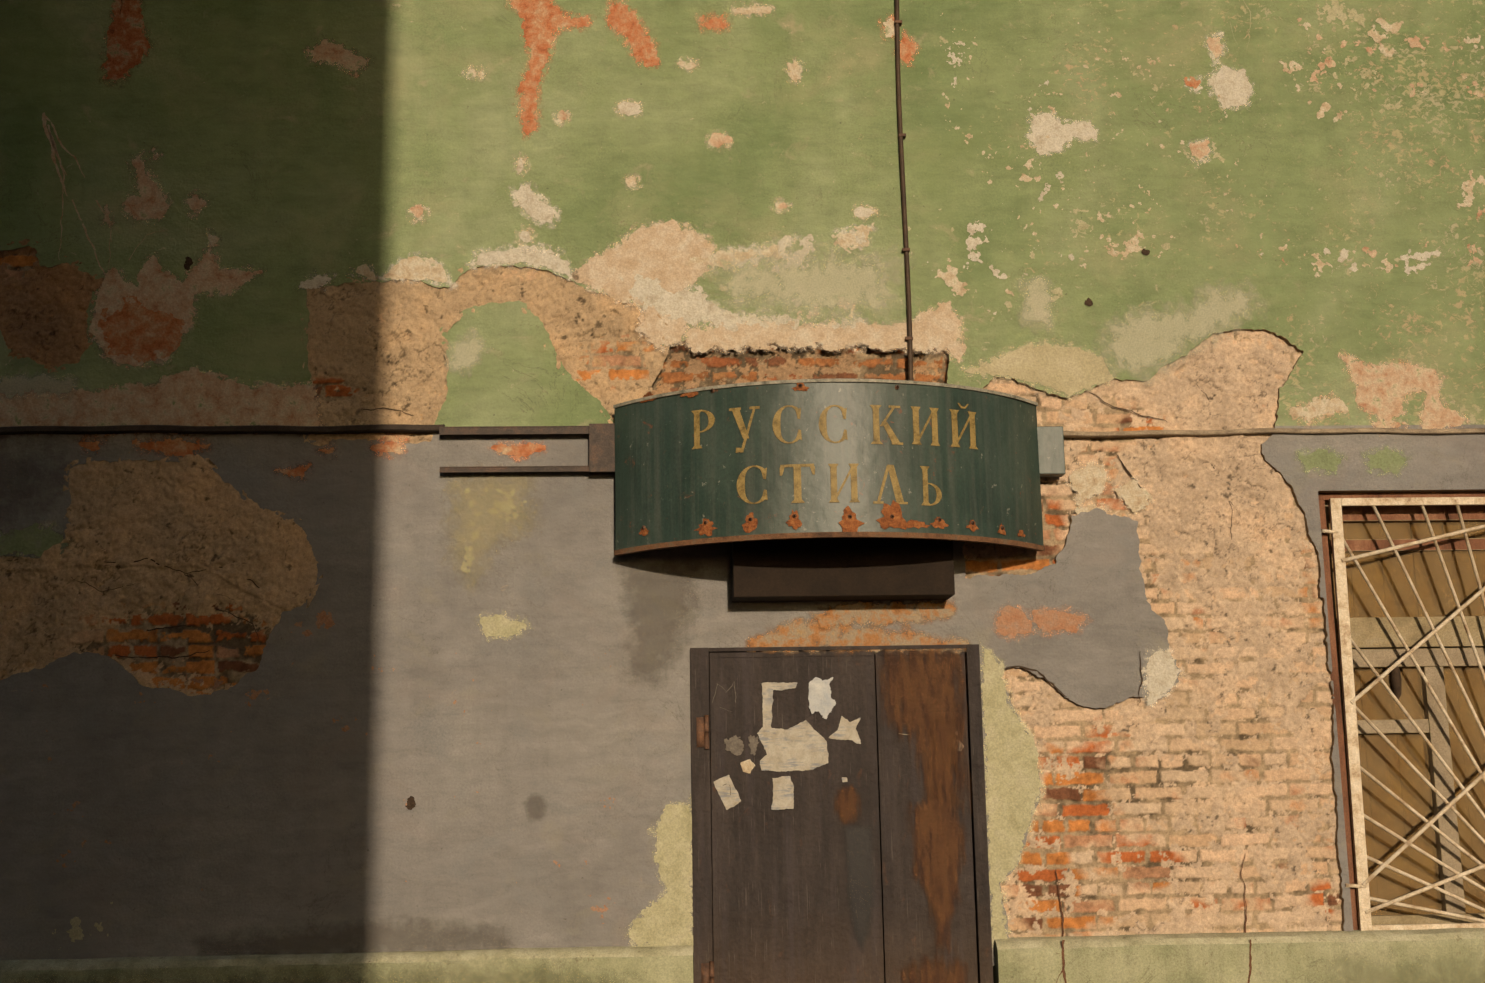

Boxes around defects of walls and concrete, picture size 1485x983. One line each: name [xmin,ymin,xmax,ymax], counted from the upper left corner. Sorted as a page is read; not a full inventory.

spalling [0,0,1253,707]
spalling [962,330,1469,943]
flaking render [629,804,693,947]
crack [1055,869,1067,983]
crack [1240,857,1252,983]